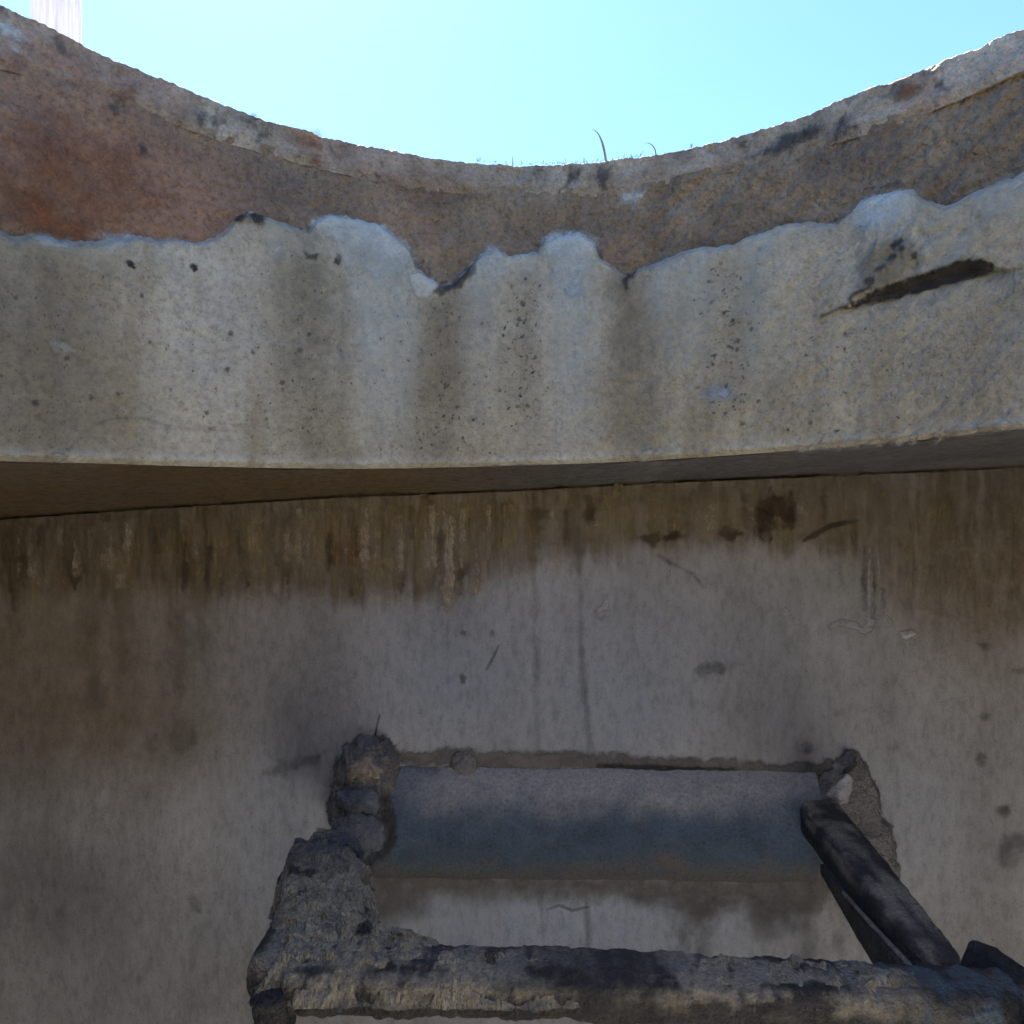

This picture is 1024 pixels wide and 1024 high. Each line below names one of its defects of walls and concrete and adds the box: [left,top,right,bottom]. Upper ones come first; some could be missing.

spalling [774,124,819,154]
spalling [235,213,264,222]
peeling [291,252,341,271]
spalling [864,239,917,285]
peeling [826,773,854,805]